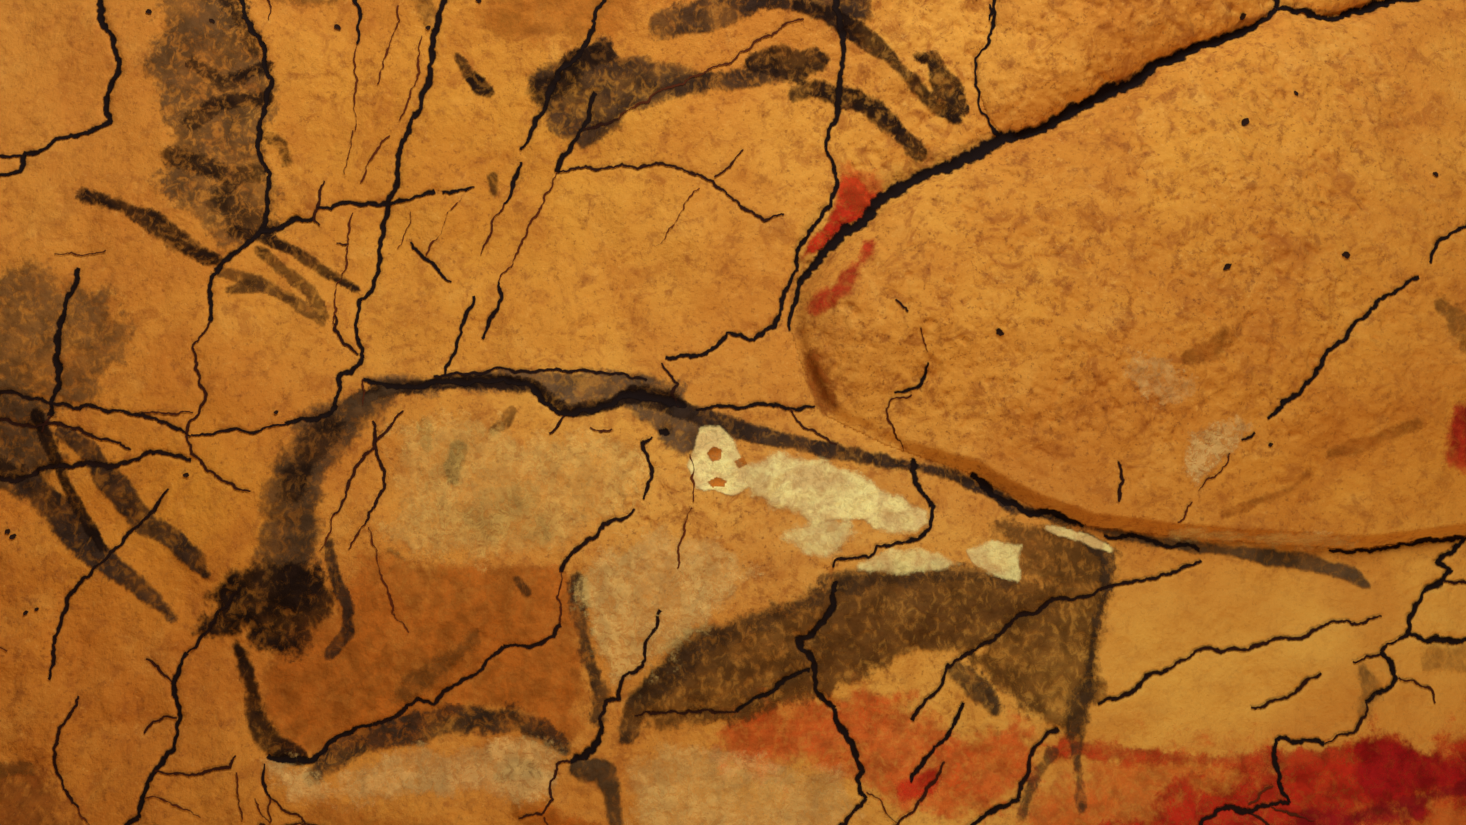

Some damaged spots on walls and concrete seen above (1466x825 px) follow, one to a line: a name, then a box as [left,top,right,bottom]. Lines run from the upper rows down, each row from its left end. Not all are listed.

crack [48,488,169,825]
crack [124,428,670,825]
crack [0,0,1419,633]
crack [518,225,1466,825]